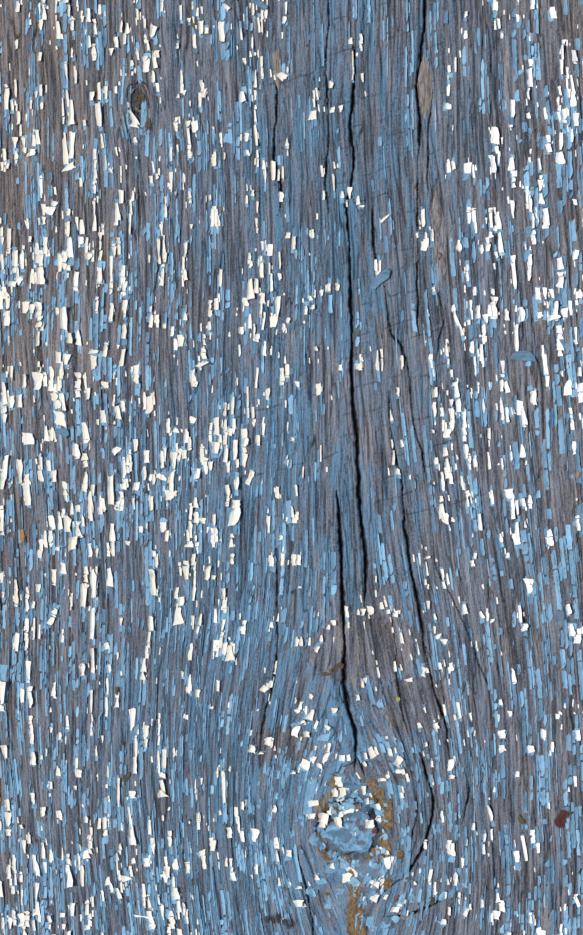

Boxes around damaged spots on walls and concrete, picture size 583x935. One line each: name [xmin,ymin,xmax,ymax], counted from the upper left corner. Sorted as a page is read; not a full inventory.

peeling [179,0,289,183]
peeling [0,0,270,935]
peeling [228,183,300,387]
peeling [291,693,331,741]
crack [324,6,368,781]
peeling [294,576,420,660]
crack [383,0,445,466]
peeling [428,240,537,531]
peeling [466,207,517,289]
peeling [499,488,533,558]
peeling [488,39,583,430]
peeling [278,736,505,932]